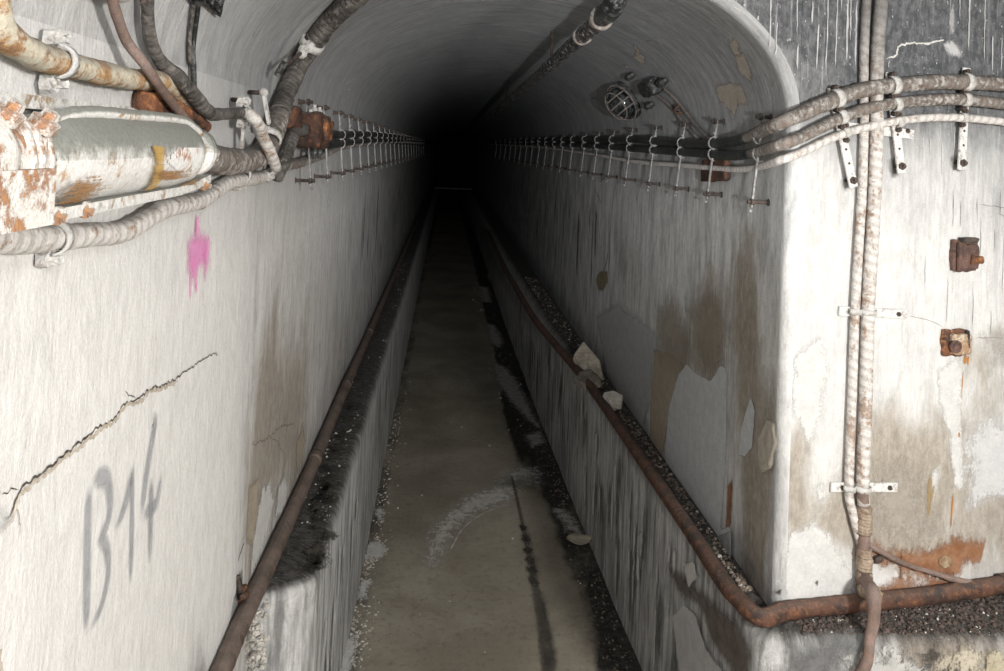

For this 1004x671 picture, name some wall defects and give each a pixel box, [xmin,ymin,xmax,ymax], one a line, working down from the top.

crack [3,352,218,529]
peeling [229,476,288,625]
leakage [491,296,645,619]
peeling [597,305,733,557]
leakage [653,545,751,671]
peeling [738,398,755,457]
leakage [782,635,864,671]
leakage [871,460,942,546]
corrosion [872,494,986,590]
peeling [931,467,940,499]
leakage [906,644,972,671]
peeling [937,358,1004,509]